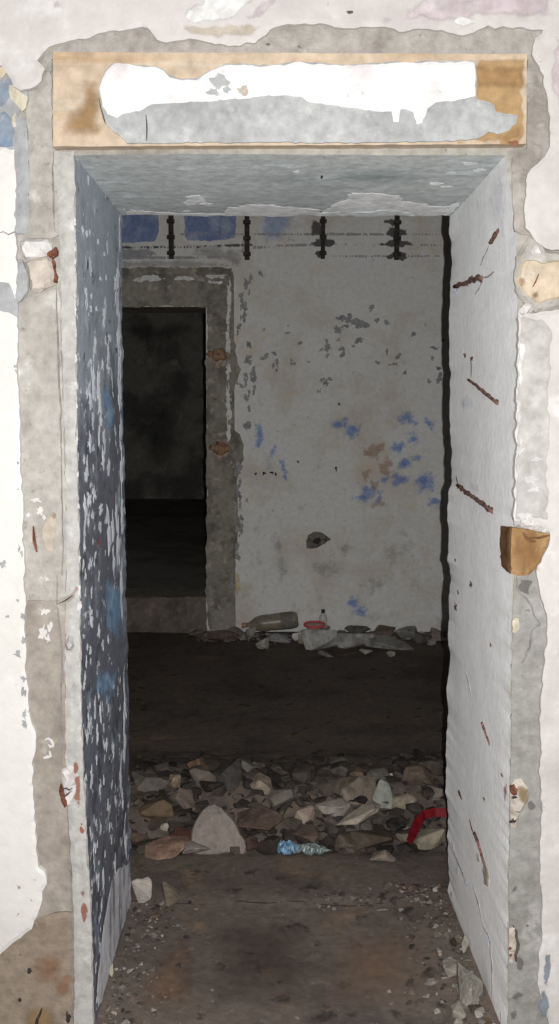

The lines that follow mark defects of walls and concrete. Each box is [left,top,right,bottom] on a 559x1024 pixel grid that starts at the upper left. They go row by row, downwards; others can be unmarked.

flaking render [41,25,559,317]
peeling [319,305,390,358]
flaking render [0,67,75,1024]
flaking render [74,257,310,912]
rust [59,763,80,808]